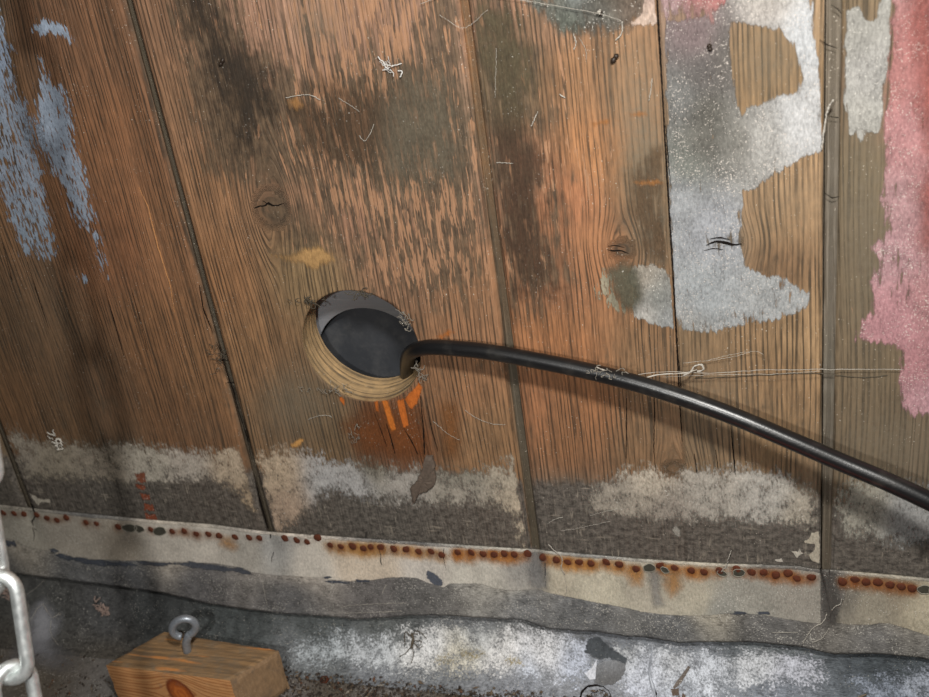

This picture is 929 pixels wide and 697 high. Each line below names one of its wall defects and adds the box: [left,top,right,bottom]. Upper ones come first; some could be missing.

peeling [0,9,109,280]
leakage [191,0,274,143]
leakage [294,68,457,184]
leakage [478,2,552,284]
peeling [594,0,822,333]
peeling [843,0,929,418]
crack [199,285,274,562]
leakage [0,383,821,624]
rust [327,542,530,563]
rust [542,554,641,582]
leakage [834,478,929,549]